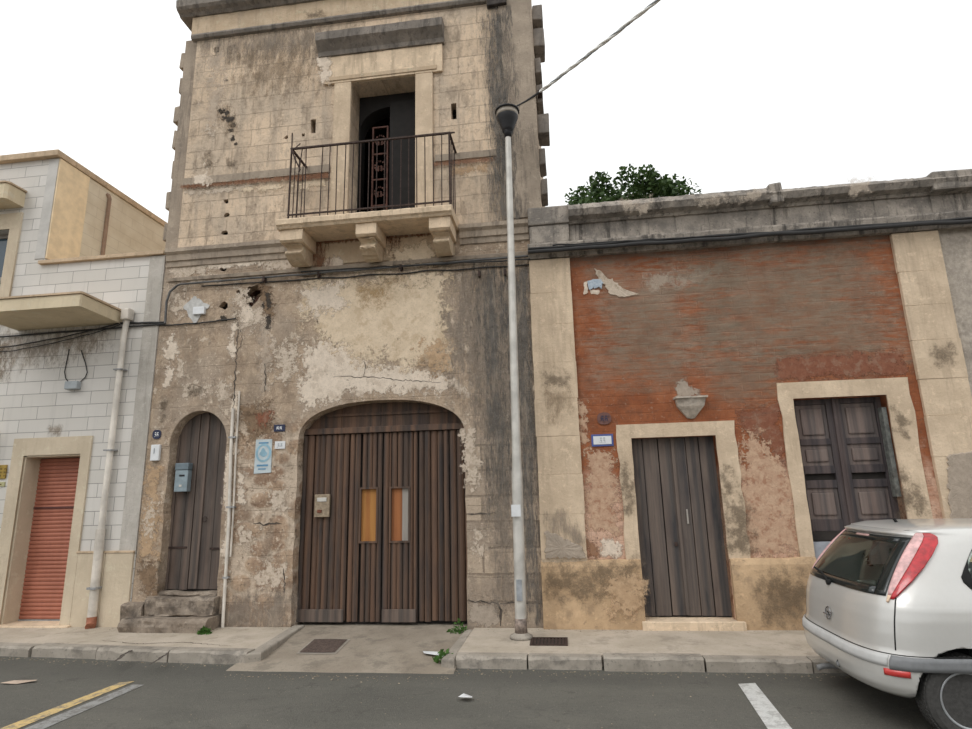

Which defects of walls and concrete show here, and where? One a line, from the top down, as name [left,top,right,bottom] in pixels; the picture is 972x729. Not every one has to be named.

water stain [480,6,521,221]
flaking render [583,268,639,298]
crack [226,320,243,434]
flaking render [162,238,475,596]
crack [336,362,440,383]
spalling [457,427,484,493]
water stain [442,263,634,625]
peeling [577,399,624,559]
peeling [735,402,800,558]
spalling [946,451,972,518]
spalling [469,599,500,628]